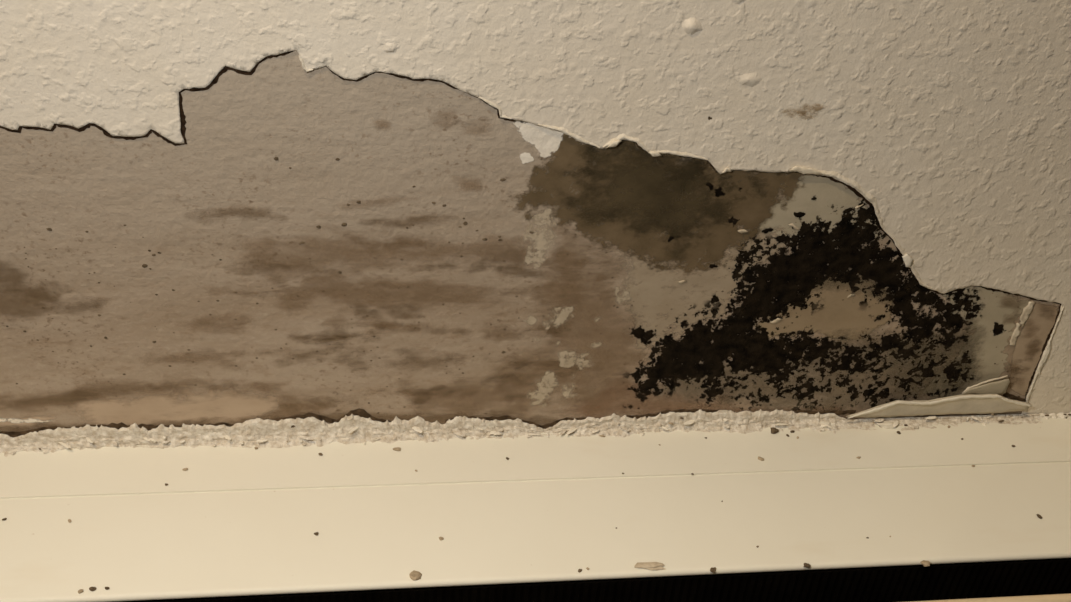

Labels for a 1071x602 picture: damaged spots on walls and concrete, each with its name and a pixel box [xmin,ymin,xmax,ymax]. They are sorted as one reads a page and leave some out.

peeling [0,50,1064,447]
damp [515,134,983,411]
damp [992,322,1007,348]